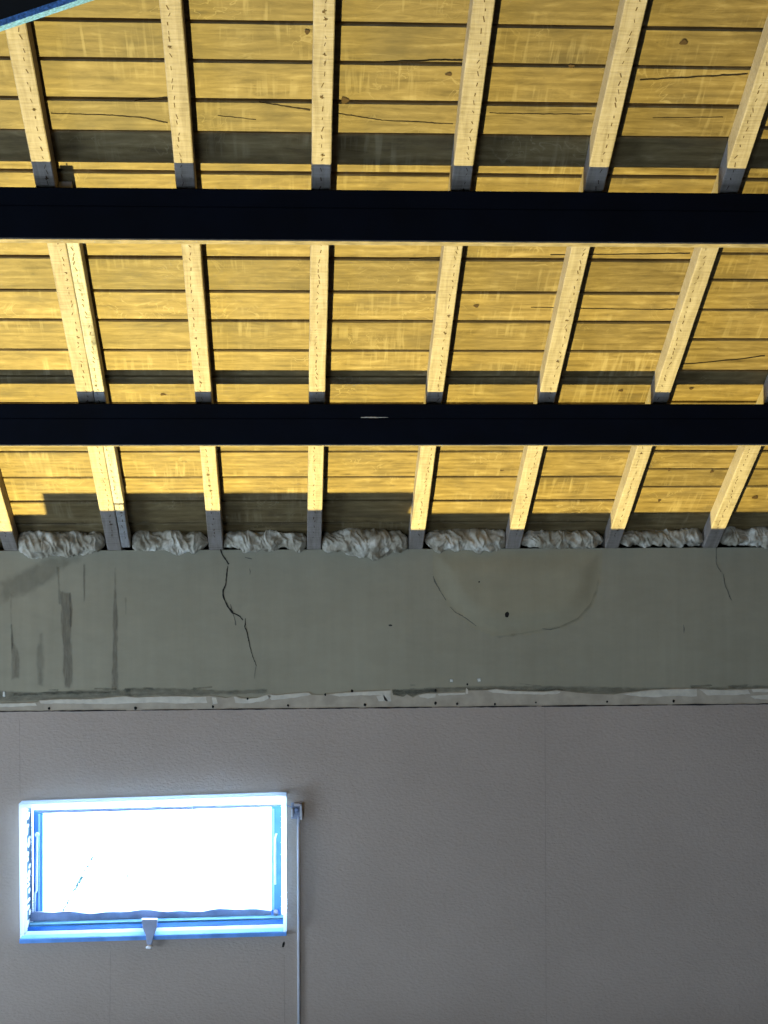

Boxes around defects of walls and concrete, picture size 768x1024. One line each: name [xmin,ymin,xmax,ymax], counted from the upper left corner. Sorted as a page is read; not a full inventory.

crack [220,549,257,677]
peeling [0,688,768,712]